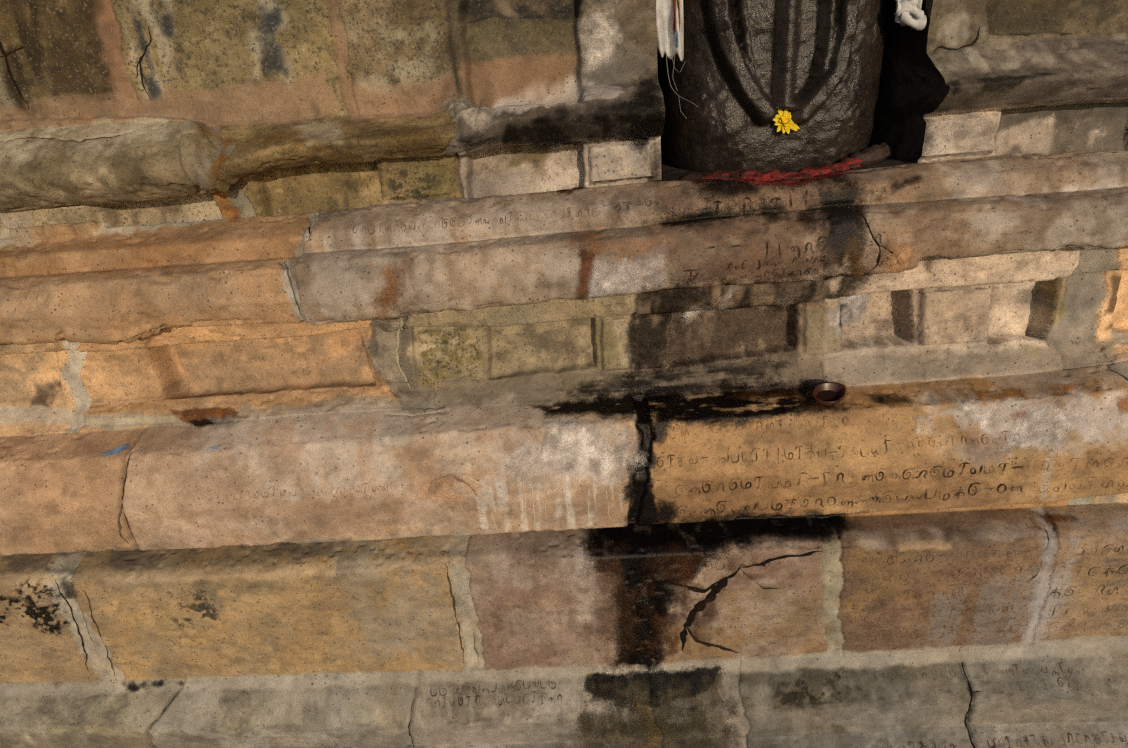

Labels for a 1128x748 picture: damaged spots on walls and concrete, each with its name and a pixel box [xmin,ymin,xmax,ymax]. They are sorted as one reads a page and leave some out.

leakage [634,72,664,150]
leakage [892,176,921,189]
leakage [662,203,785,226]
leakage [734,170,875,256]
leakage [568,308,786,443]
leakage [625,473,635,500]
leakage [655,500,676,523]
leakage [0,580,75,635]
crack [676,551,823,653]
leakage [778,676,841,706]
crack [962,662,981,748]